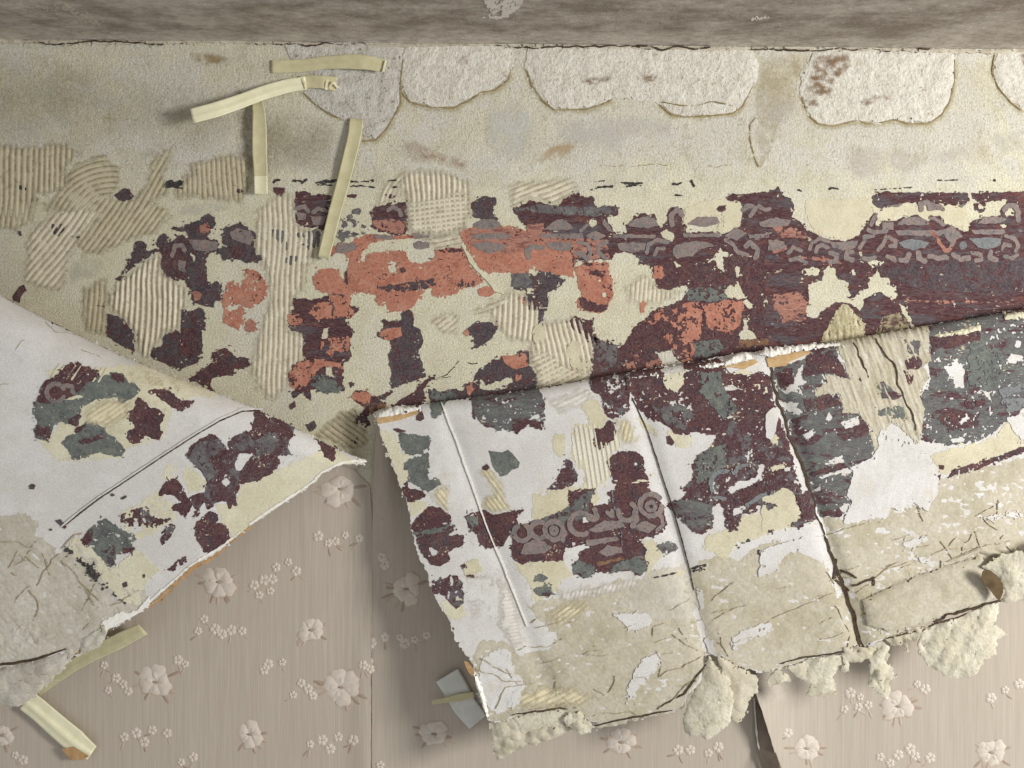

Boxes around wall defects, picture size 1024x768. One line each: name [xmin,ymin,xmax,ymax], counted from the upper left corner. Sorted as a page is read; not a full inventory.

peeling [115,214,268,392]
peeling [106,314,138,355]
peeling [33,361,125,405]
peeling [34,425,52,441]
peeling [68,414,108,445]
peeling [595,423,616,444]
peeling [810,463,847,477]
peeling [668,478,773,556]
peeling [80,529,95,547]
crack [0,410,260,666]
crack [435,357,1013,726]
peeling [572,556,648,578]